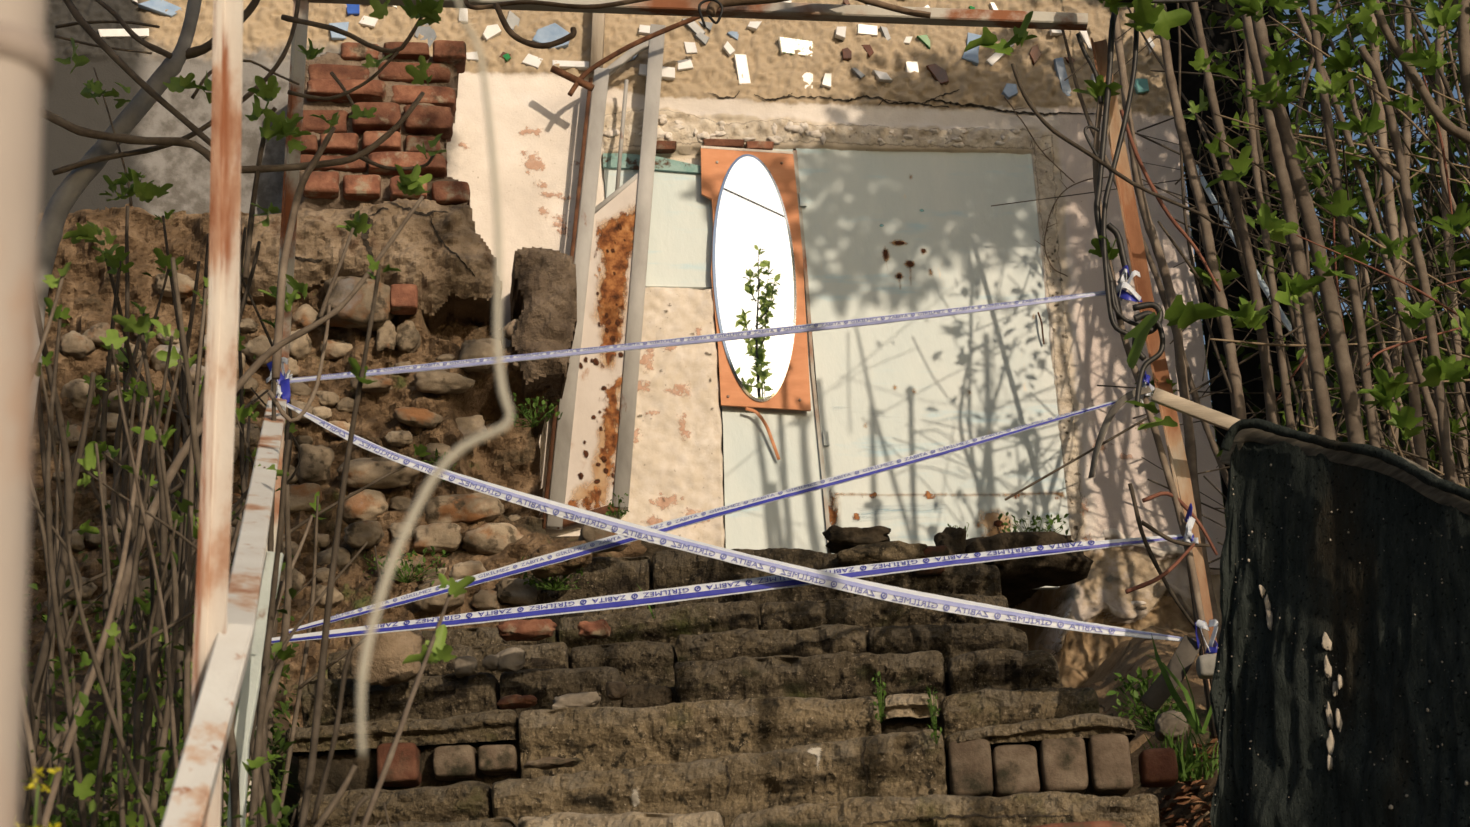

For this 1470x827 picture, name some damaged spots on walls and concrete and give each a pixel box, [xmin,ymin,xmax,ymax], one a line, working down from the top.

peeling [519,127,571,234]
rust [883,241,932,278]
rust [568,210,636,511]